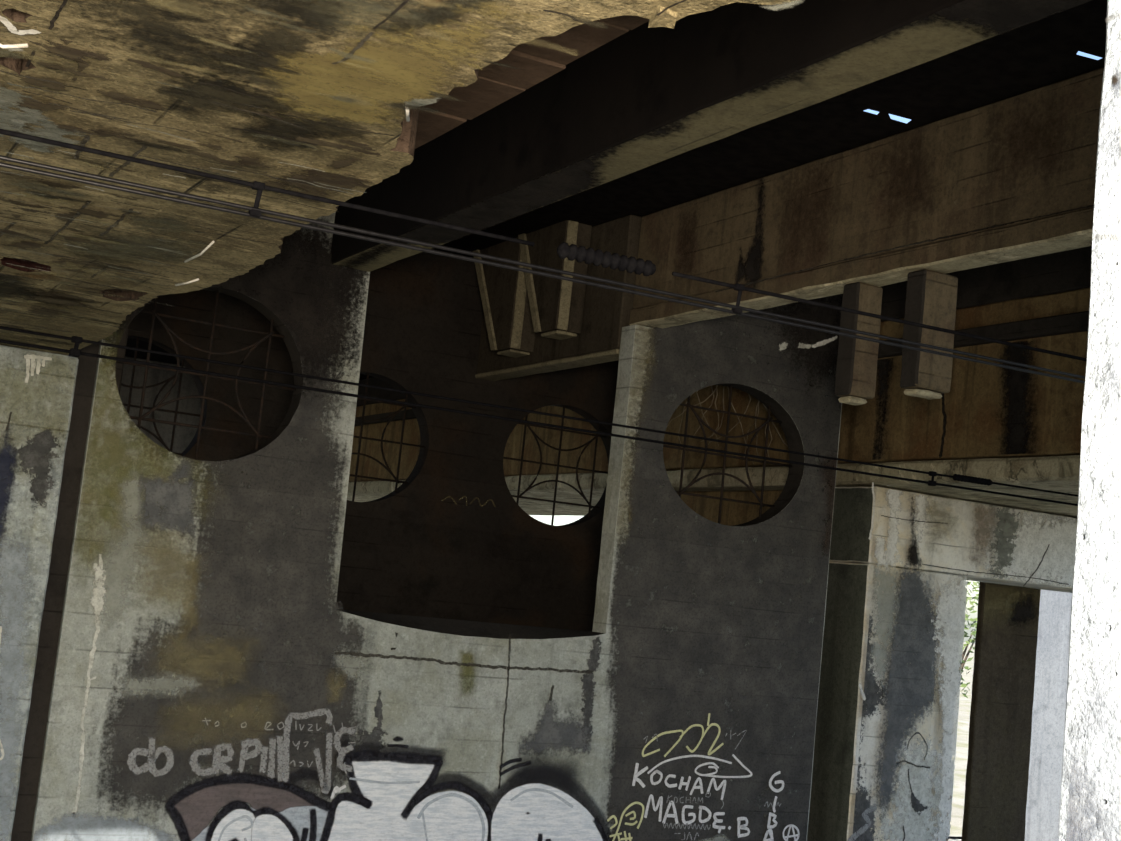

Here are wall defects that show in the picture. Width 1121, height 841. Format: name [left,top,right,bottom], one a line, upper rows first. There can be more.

spalling [2,8,33,23]
damp [0,16,41,51]
peeling [0,39,394,212]
damp [51,0,539,194]
damp [0,191,197,306]
peeling [0,170,274,350]
damp [736,179,765,289]
crack [715,205,1094,292]
damp [977,508,1077,618]
damp [853,482,970,841]